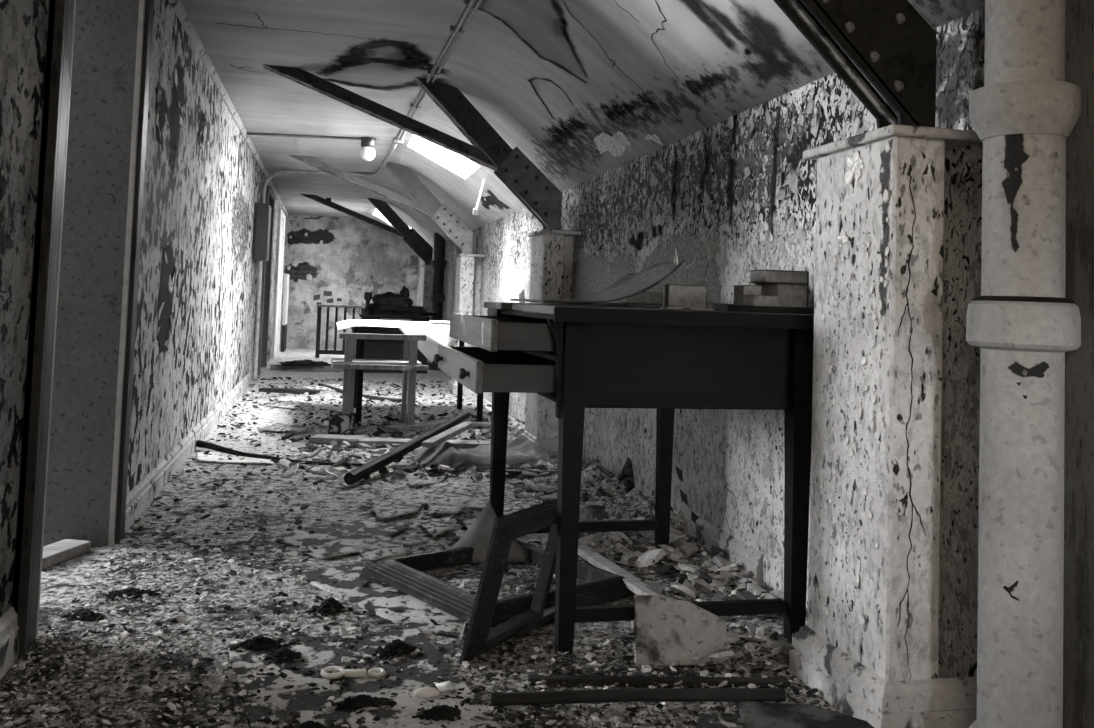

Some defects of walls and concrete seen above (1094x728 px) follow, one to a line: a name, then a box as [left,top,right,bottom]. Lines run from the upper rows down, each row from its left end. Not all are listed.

peeling [155,63,185,181]
damp [317,40,446,91]
damp [464,0,587,84]
damp [528,0,821,237]
peeling [157,244,179,355]
peeling [230,187,249,269]
flaking render [284,261,319,284]
flaking render [287,227,336,245]
peeling [568,88,831,307]
peeling [1001,133,1030,252]
crack [897,176,925,681]
peeling [1008,362,1049,399]